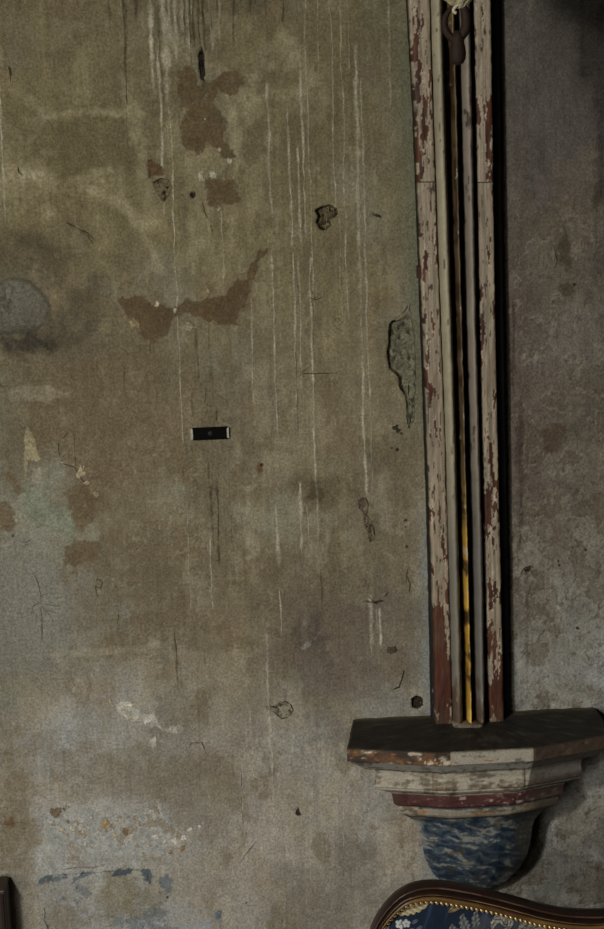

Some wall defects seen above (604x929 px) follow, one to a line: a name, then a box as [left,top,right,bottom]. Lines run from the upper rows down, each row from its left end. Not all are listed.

damp [149,0,212,167]
peeling [177,47,244,163]
damp [288,78,312,243]
flaking render [315,204,337,230]
damp [0,275,70,357]
peeling [118,248,268,342]
damp [299,418,319,551]
peeling [451,716,483,728]